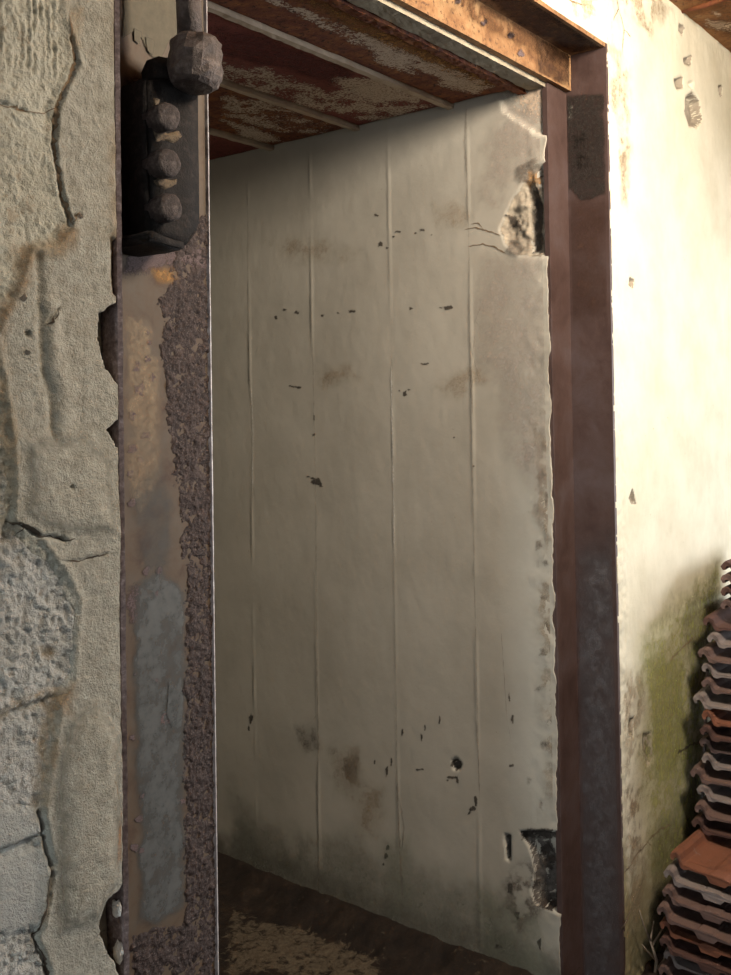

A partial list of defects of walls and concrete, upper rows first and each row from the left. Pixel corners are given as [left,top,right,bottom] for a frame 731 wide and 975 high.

corrosion [215,29,351,81]
corrosion [451,0,600,83]
crack [0,14,82,225]
spalling [674,76,702,128]
spalling [500,159,545,257]
corrosion [111,245,207,281]
spalling [521,829,557,911]
crack [31,863,52,975]